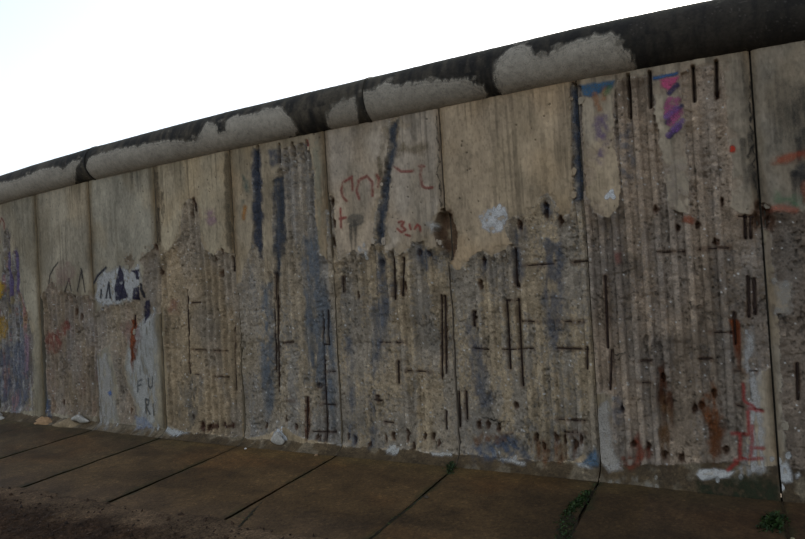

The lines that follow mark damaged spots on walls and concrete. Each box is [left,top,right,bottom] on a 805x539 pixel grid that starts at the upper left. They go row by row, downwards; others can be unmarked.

spalling [0,229,34,413]
peeling [0,157,80,205]
spalling [40,32,805,483]
rust [658,366,673,412]